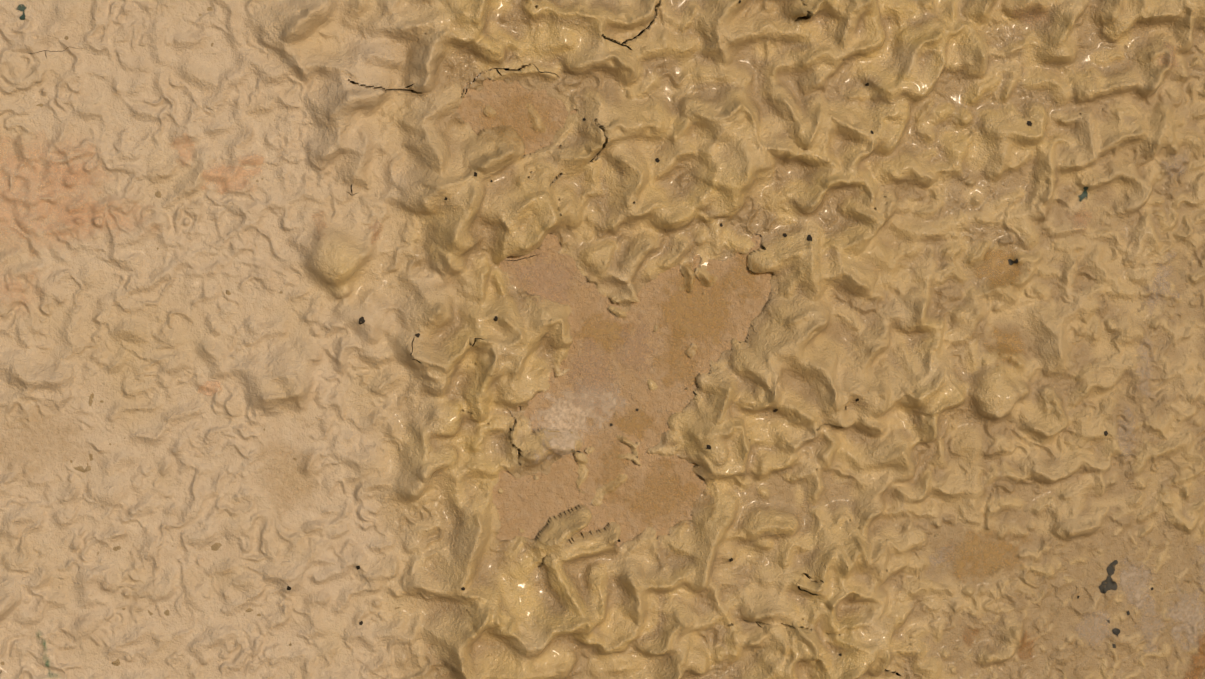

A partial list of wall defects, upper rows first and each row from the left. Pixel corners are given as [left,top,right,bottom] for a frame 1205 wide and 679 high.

crack [614,6,656,50]
crack [465,63,560,94]
peeling [457,71,579,163]
peeling [480,233,774,547]
peeling [941,512,1205,679]